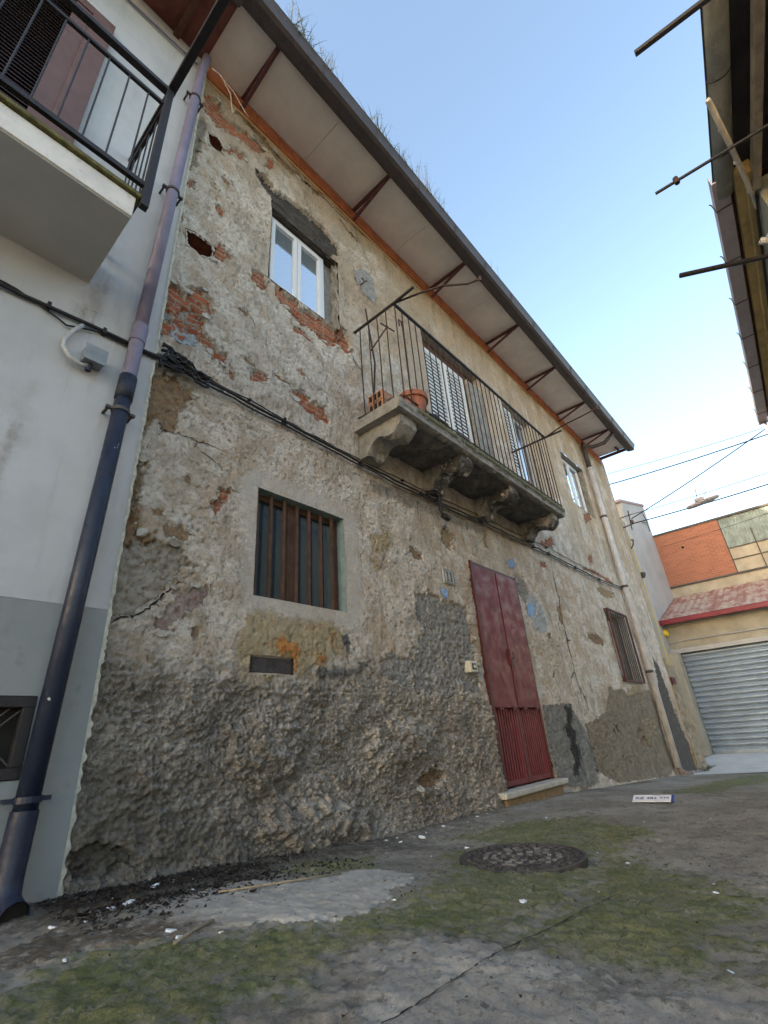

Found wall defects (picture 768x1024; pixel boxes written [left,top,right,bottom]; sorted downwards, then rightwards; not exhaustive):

flaking render [187,95,321,196]
spalling [181,216,230,263]
flaking render [160,279,236,392]
flaking render [250,267,351,354]
flaking render [242,355,329,424]
flaking render [210,484,236,515]
crack [110,575,189,623]
corrosion [237,609,343,693]
flaking render [380,592,483,697]